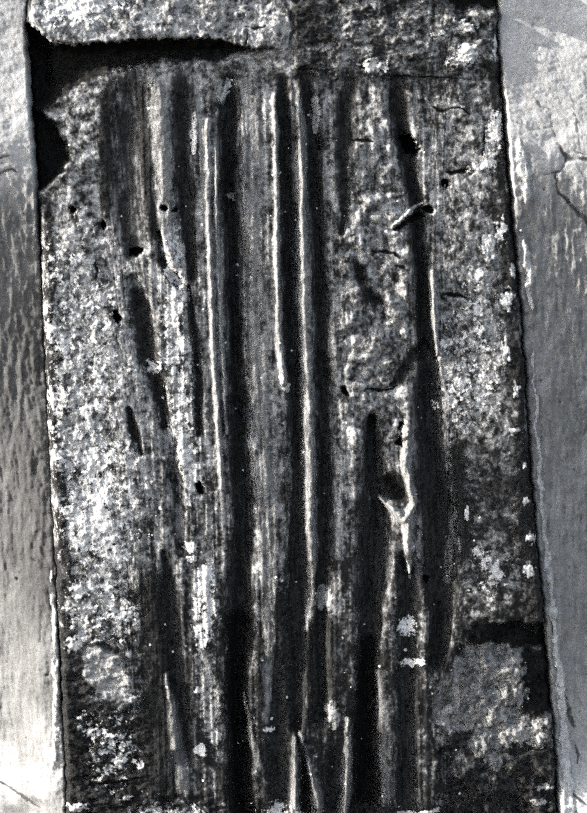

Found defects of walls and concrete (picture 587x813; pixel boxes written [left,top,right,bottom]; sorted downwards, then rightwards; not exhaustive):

crack [0,155,18,174]
water stain [38,199,195,813]
spalling [27,24,272,192]
water stain [99,59,205,437]
water stain [217,0,557,813]
crack [545,144,587,224]